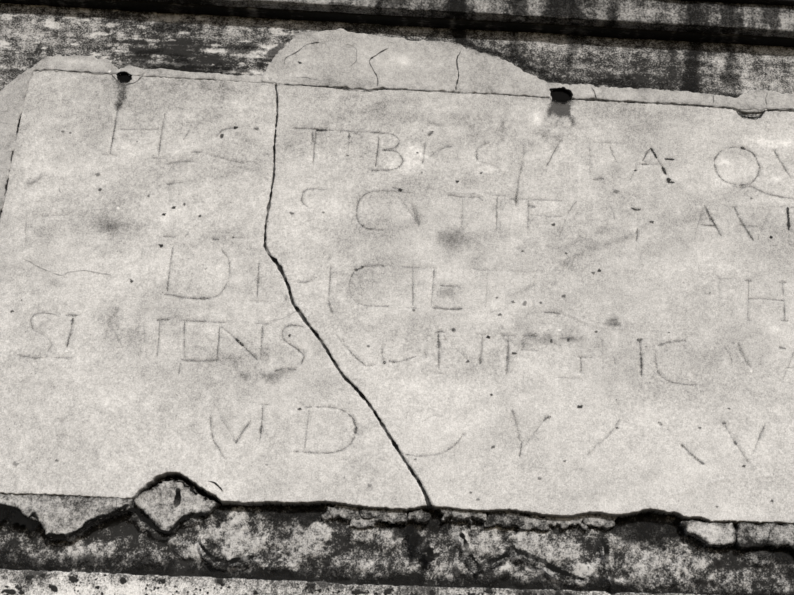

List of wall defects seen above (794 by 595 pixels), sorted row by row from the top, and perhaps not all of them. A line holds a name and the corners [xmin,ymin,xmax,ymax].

damp [441,0,471,19]
damp [511,0,529,23]
damp [543,0,585,26]
damp [759,4,780,28]
damp [680,0,710,92]
damp [719,2,743,87]
damp [547,101,575,125]
crack [263,48,433,508]
spalling [134,476,221,534]
peeling [322,504,617,532]
crack [406,525,435,562]
peeling [684,577,794,595]